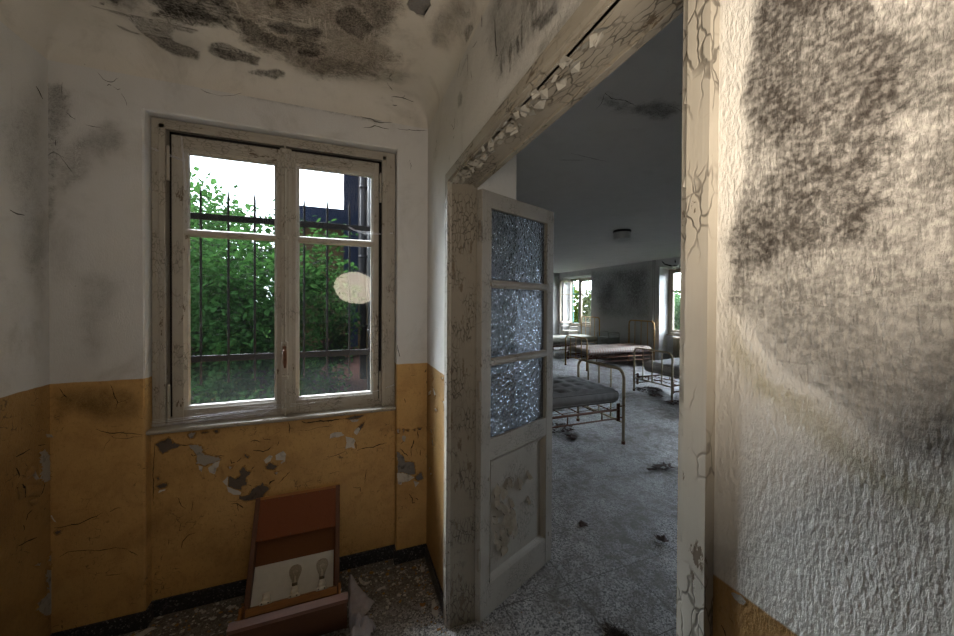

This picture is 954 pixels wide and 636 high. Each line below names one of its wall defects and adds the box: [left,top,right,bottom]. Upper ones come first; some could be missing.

water stain [95,0,398,79]
flaking render [407,0,431,17]
mould [744,0,901,262]
peeling [154,428,271,502]
peeling [330,414,365,449]
peeling [396,300,449,487]